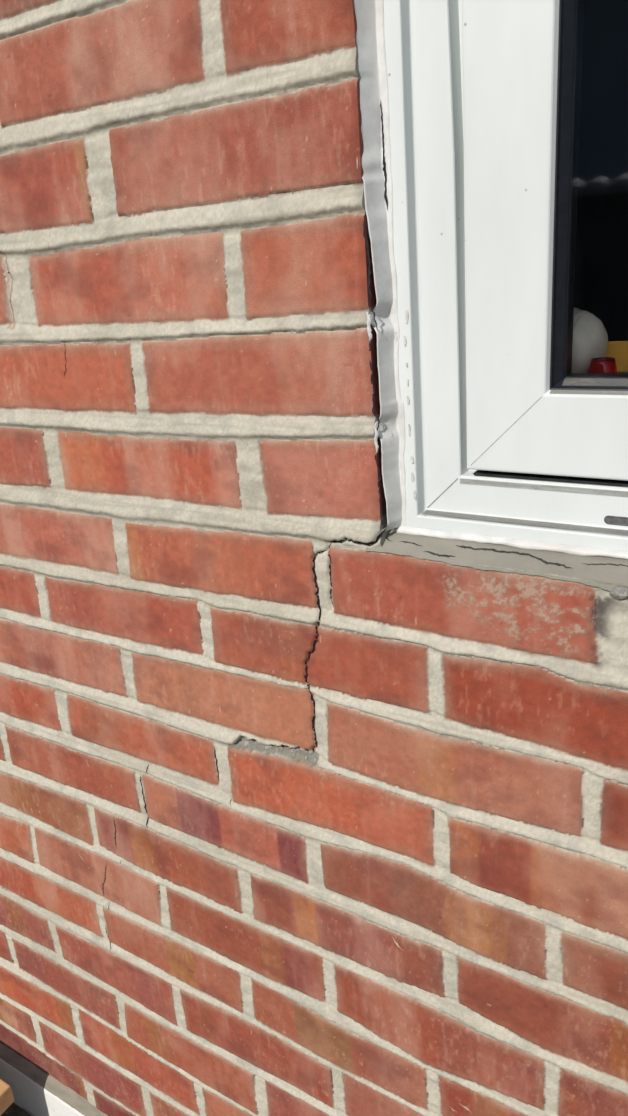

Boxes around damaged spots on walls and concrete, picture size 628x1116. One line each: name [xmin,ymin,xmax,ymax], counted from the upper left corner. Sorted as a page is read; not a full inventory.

crack [304,528,628,748]
spalling [231,736,319,764]